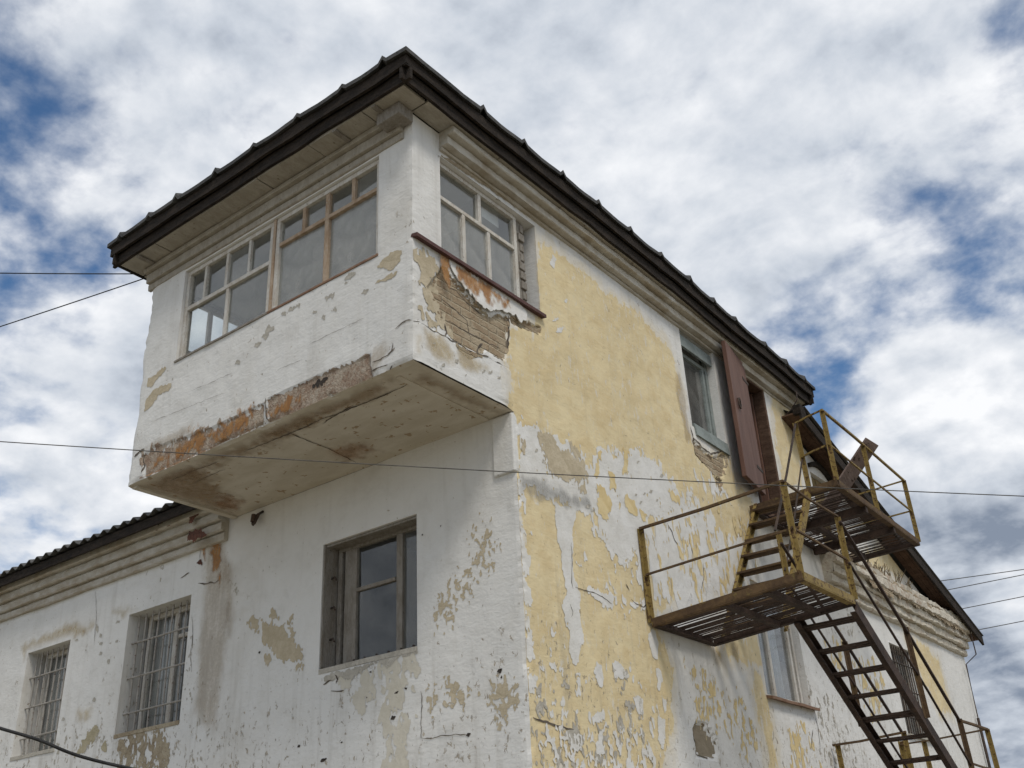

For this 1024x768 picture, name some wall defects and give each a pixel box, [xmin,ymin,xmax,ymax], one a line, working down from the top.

flaking render [361,247,541,379]
spalling [139,354,373,476]
flaking render [187,514,207,542]
peeling [246,607,304,671]
peeling [324,414,765,768]
peeling [53,717,173,768]